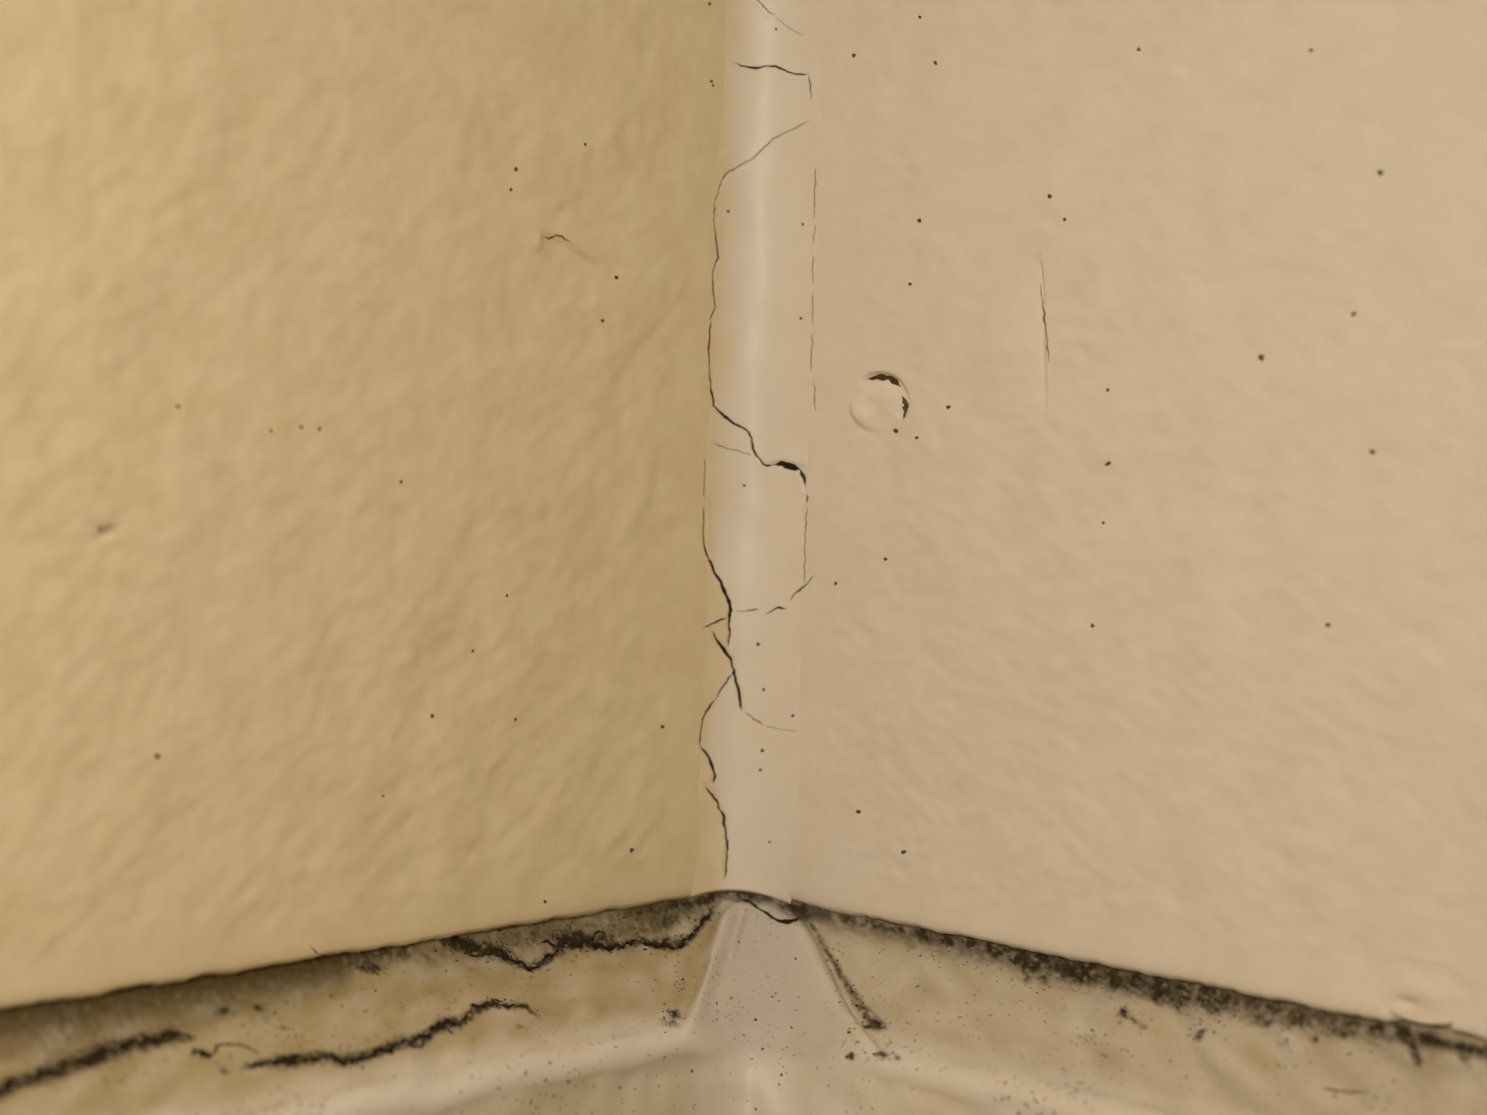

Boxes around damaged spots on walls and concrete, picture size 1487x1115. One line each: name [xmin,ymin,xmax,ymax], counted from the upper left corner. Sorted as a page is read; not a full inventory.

crack [809,169,817,409]